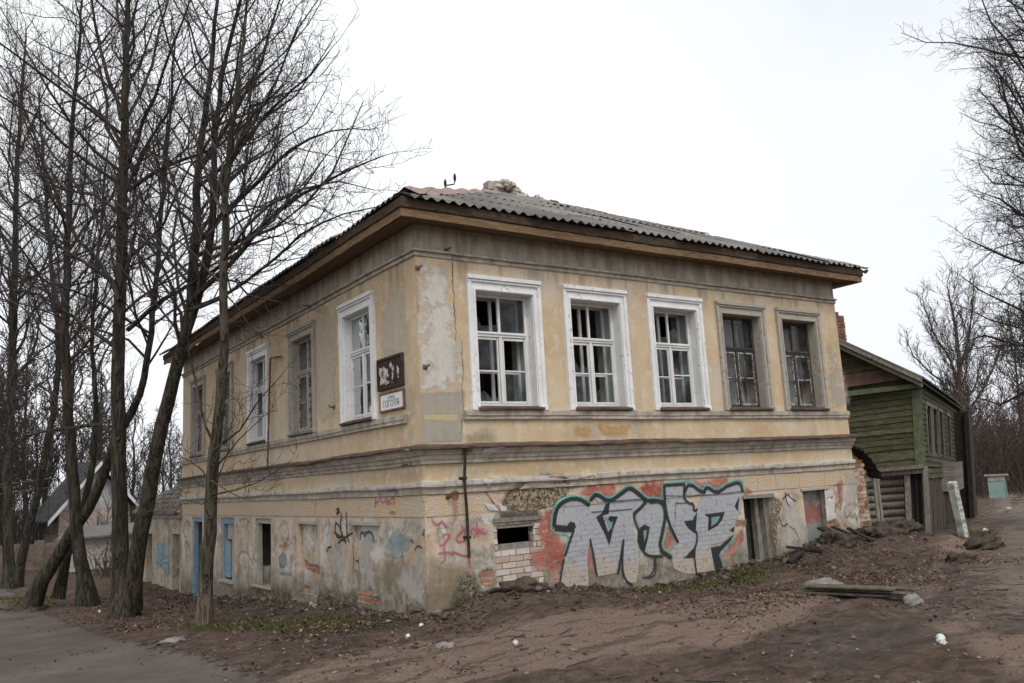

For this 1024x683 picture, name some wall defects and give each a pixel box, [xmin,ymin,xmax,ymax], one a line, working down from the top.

peeling [379,264,463,411]
flaking render [482,472,595,512]
flaking render [305,560,320,574]
flaking render [304,584,381,607]